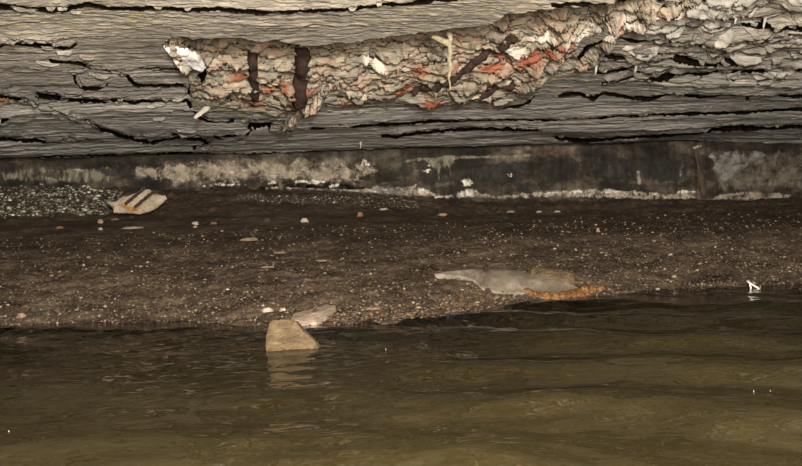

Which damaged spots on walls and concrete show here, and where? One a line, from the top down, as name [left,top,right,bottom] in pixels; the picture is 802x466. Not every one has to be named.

spalling [146,0,802,144]
crack [0,0,802,199]
damp [2,167,120,183]
damp [135,154,696,200]
damp [709,150,802,200]